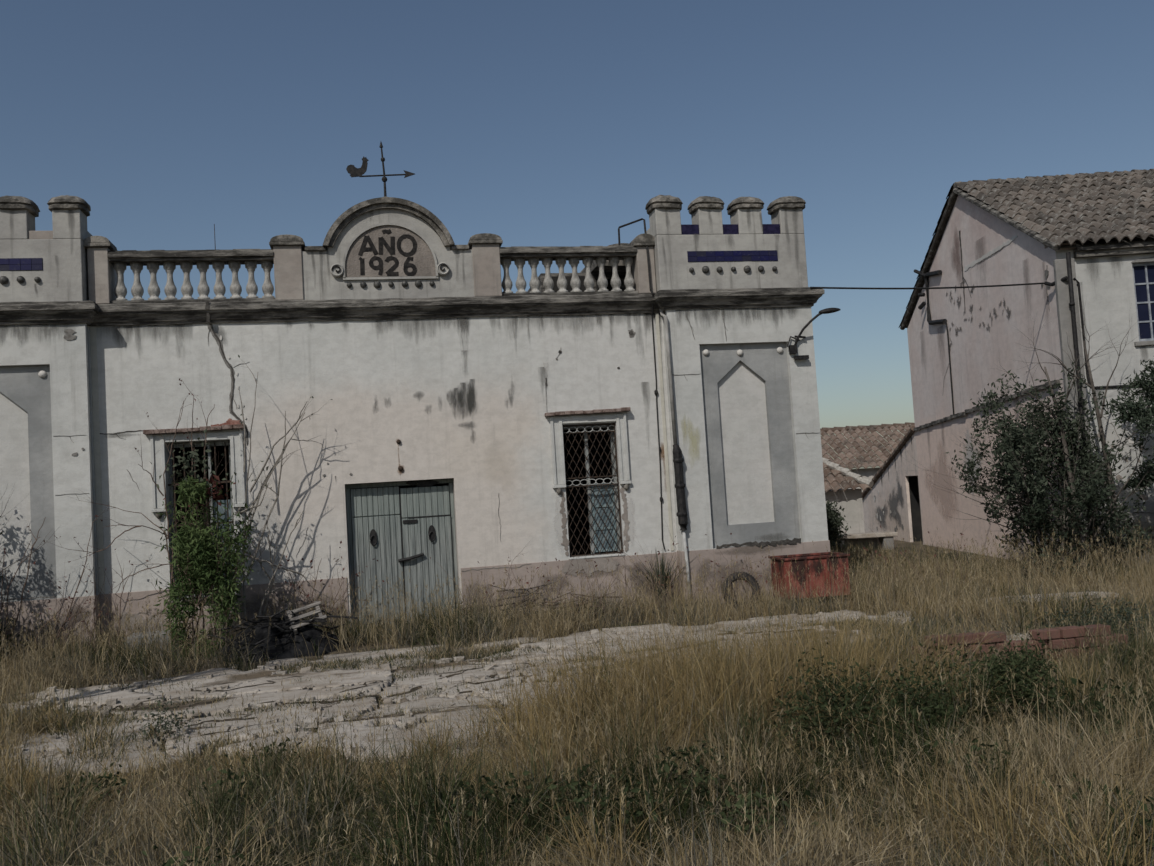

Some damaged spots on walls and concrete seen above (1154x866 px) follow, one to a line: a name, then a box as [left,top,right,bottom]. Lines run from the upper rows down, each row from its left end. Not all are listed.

damp [451,379,475,427]
crack [83,623,888,735]